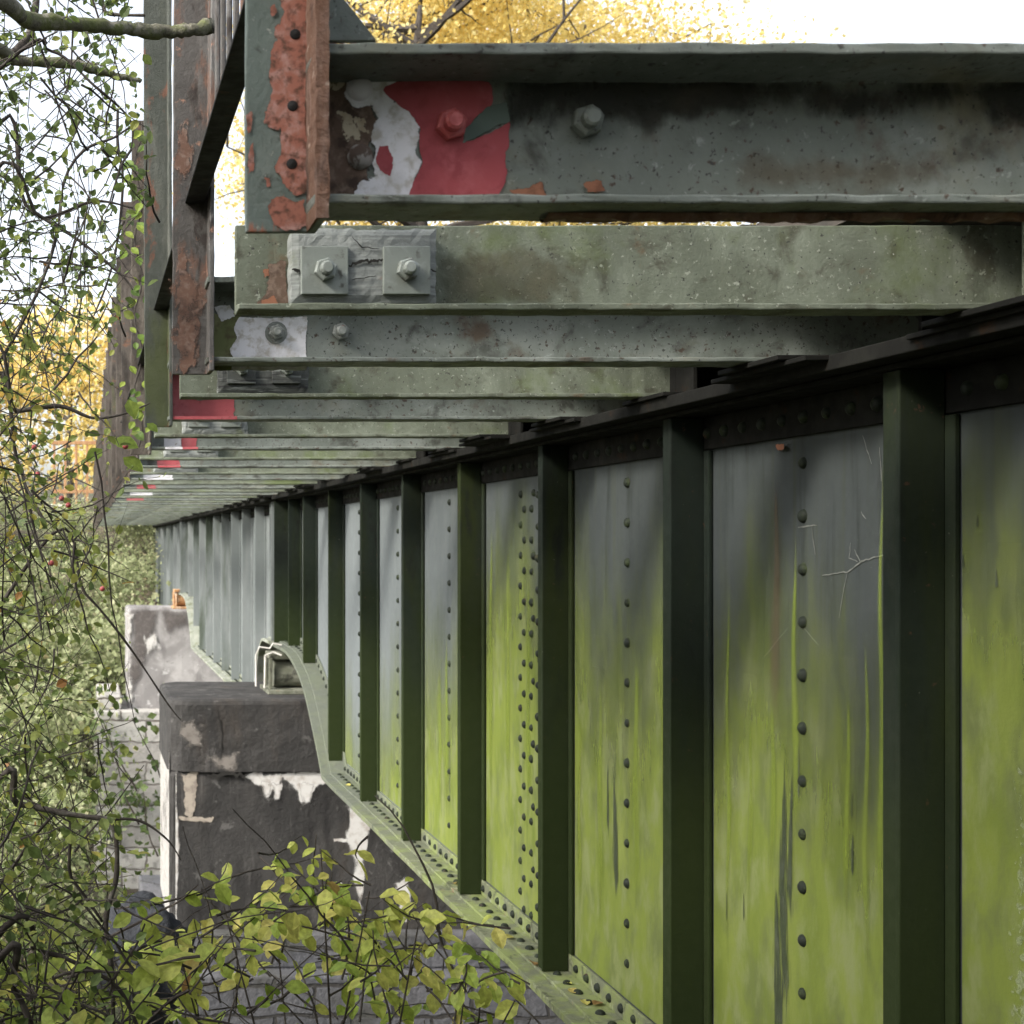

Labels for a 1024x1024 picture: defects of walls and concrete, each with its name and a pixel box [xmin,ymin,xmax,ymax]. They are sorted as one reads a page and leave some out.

rust [173,119,194,177]
peeling [329,82,422,195]
rust [509,182,546,195]
rust [168,247,207,375]
peeling [214,305,241,371]
rust [257,260,288,316]
crack [348,236,383,280]
crack [822,543,883,615]
leakage [844,558,883,903]
spalling [178,772,214,823]
leakage [598,714,618,892]
leakage [771,584,799,1024]